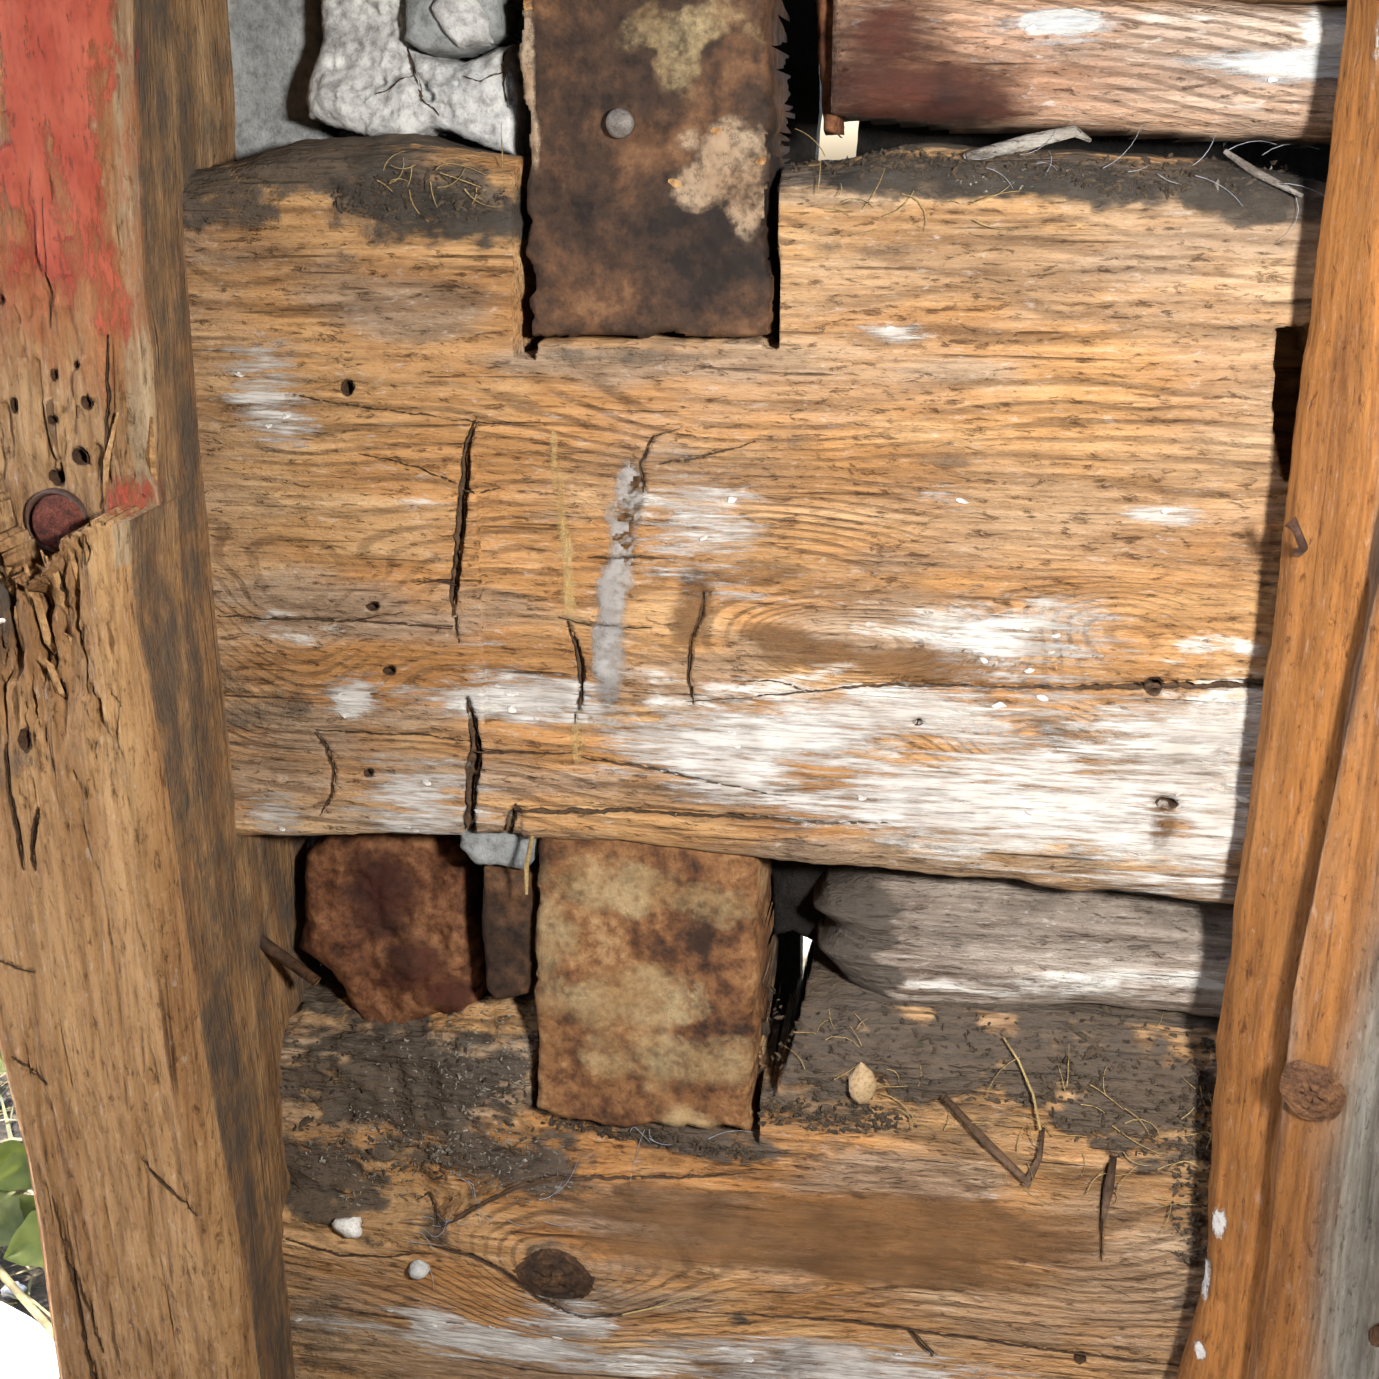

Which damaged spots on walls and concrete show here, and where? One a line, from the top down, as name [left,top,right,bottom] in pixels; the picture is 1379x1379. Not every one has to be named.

peeling [0,0,139,347]
peeling [104,479,163,517]
crack [217,394,538,643]
crack [590,554,676,562]
crack [639,427,755,493]
crack [684,592,1264,704]
crack [315,617,888,831]